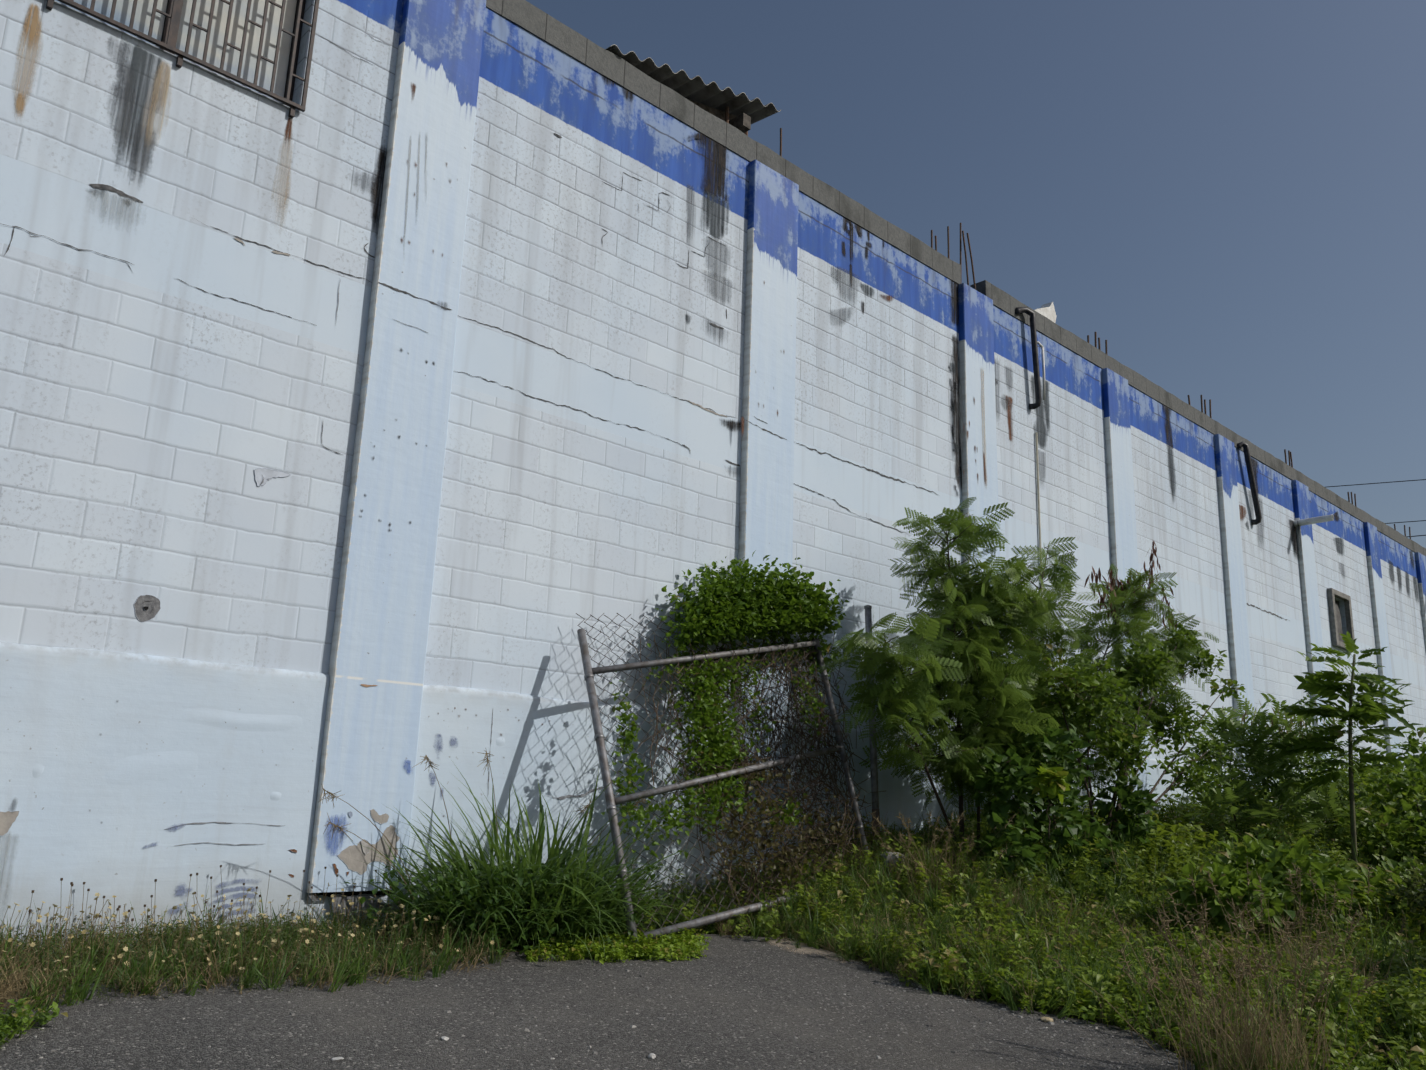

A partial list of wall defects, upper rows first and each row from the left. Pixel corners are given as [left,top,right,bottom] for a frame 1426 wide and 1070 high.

corrosion [26,6,39,41]
leakage [117,44,161,164]
leakage [372,147,387,234]
leakage [689,132,729,238]
crack [0,223,134,271]
spalling [931,223,976,290]
crack [179,224,936,494]
leakage [948,281,963,518]
crack [795,484,911,536]
spalling [134,594,161,622]
spalling [0,811,19,836]
peeling [306,809,400,916]